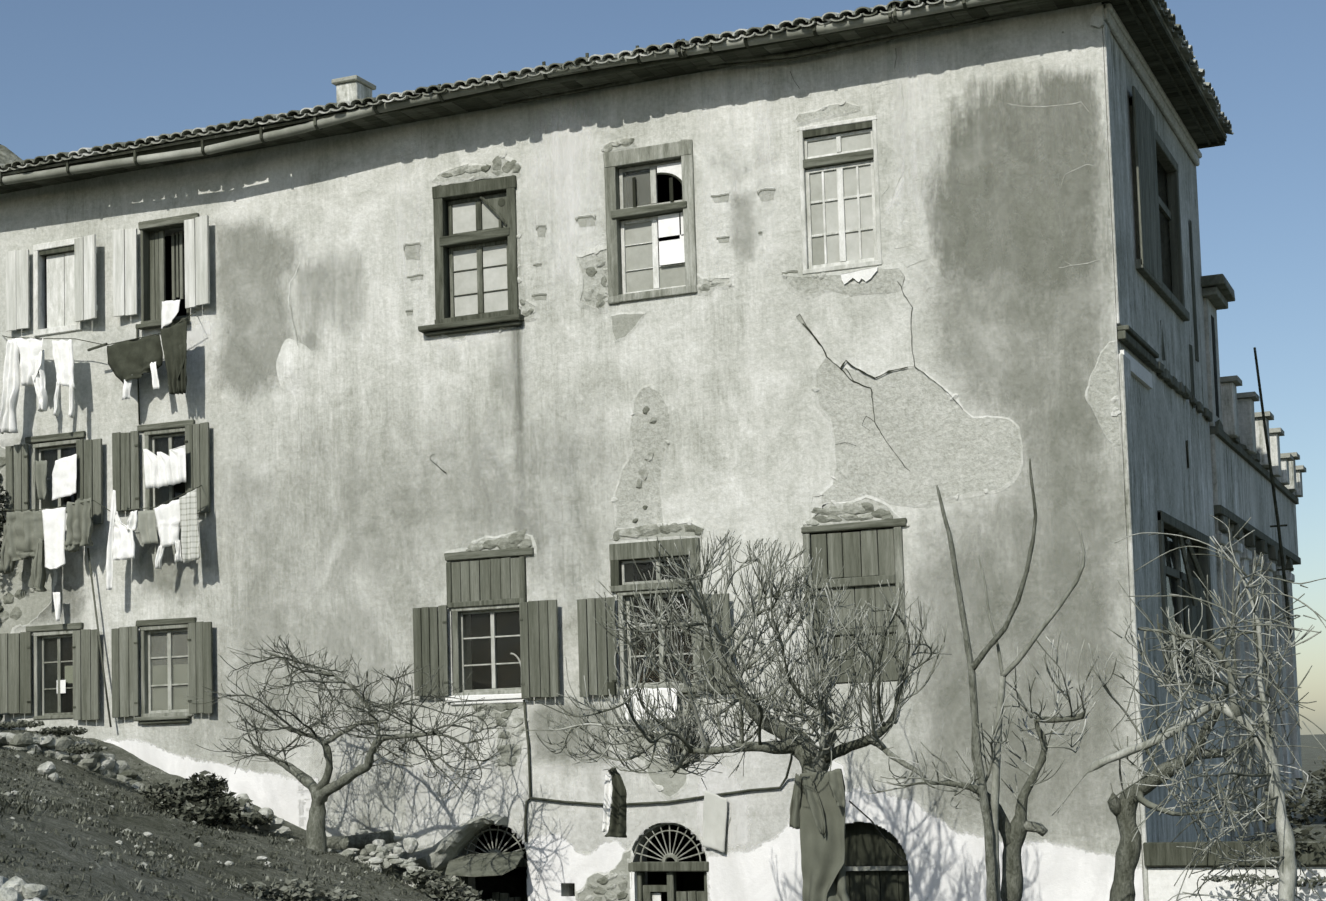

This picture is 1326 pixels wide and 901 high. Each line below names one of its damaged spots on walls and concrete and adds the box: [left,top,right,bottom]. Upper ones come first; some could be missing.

spalling [432,149,523,185]
spalling [575,244,646,343]
spalling [781,241,950,299]
spalling [610,384,705,541]
crack [796,270,962,471]
spalling [800,353,1024,528]
water stain [932,75,1115,817]
spalling [1085,340,1121,447]
spalling [444,529,538,556]
spalling [469,702,532,781]
spalling [575,848,635,901]